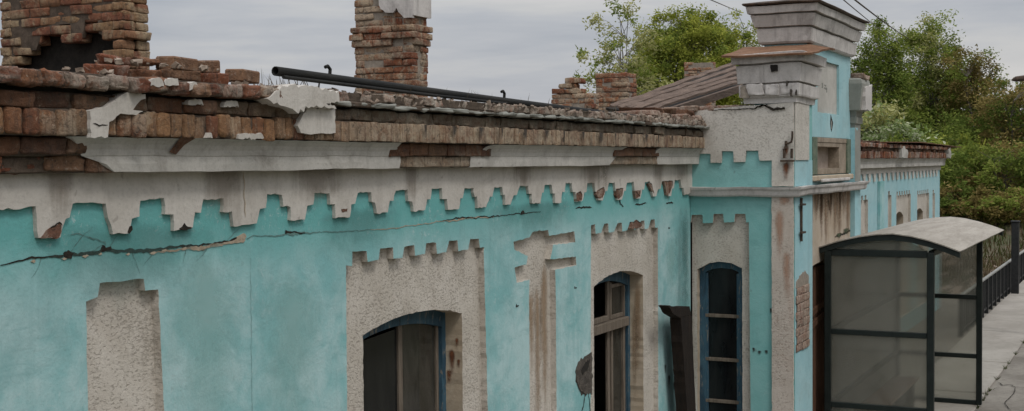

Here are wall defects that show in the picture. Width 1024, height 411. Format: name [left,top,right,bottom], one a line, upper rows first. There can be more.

peeling [85,78,203,138]
peeling [254,84,340,134]
spalling [169,133,213,154]
spalling [41,222,62,239]
crack [0,210,533,277]
spalling [574,180,673,201]
damp [812,191,850,237]
damp [529,276,547,374]